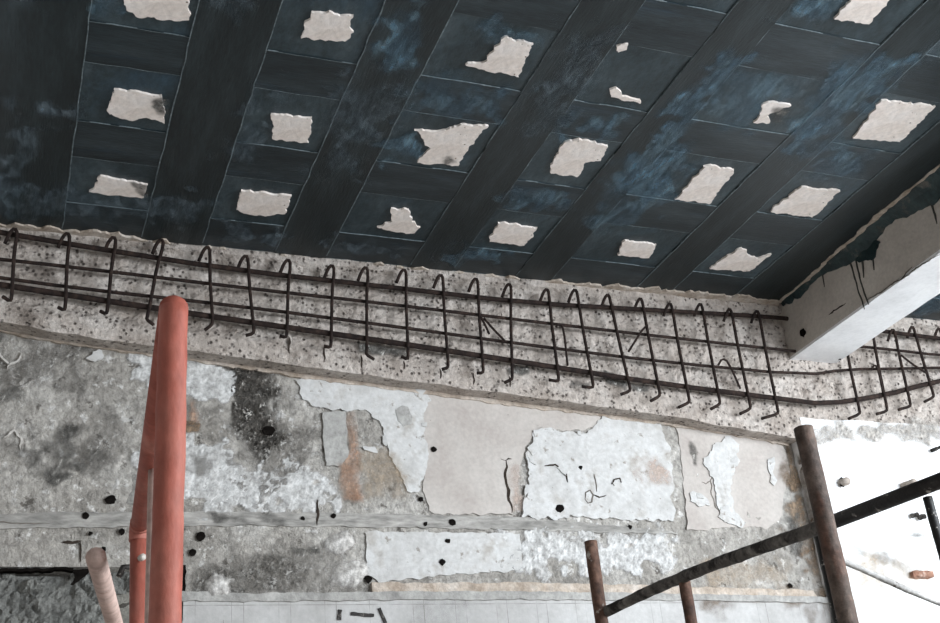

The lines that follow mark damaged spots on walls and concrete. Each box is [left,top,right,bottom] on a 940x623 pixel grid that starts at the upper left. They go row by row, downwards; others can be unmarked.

peeling [301,10,354,42]
peeling [107,88,166,124]
peeling [414,123,489,166]
peeling [550,138,608,177]
water stain [774,108,823,140]
peeling [852,99,936,142]
peeling [674,164,734,204]
peeling [770,186,840,217]
water stain [781,168,940,309]
spalling [0,227,940,446]
flaking render [521,416,676,522]
crack [180,565,188,616]